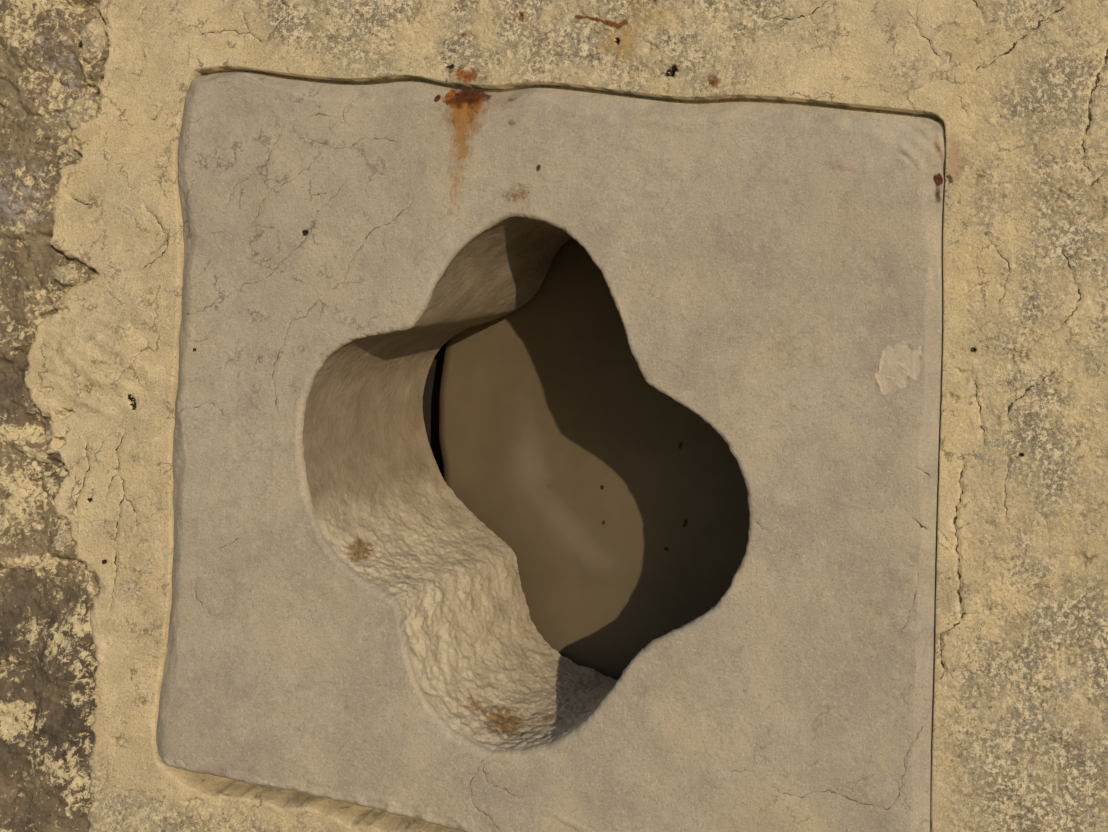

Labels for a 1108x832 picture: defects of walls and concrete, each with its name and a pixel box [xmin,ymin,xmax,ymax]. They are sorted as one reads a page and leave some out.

crack [976,3,1069,70]
corrosion [434,69,485,157]
crack [1081,49,1108,188]
crack [225,107,396,228]
crack [186,184,344,315]
crack [342,203,412,289]
crack [1052,248,1081,334]
crack [272,300,318,407]
peeling [874,340,926,395]
crack [1007,372,1053,415]
crack [470,760,520,831]
crack [774,723,928,810]